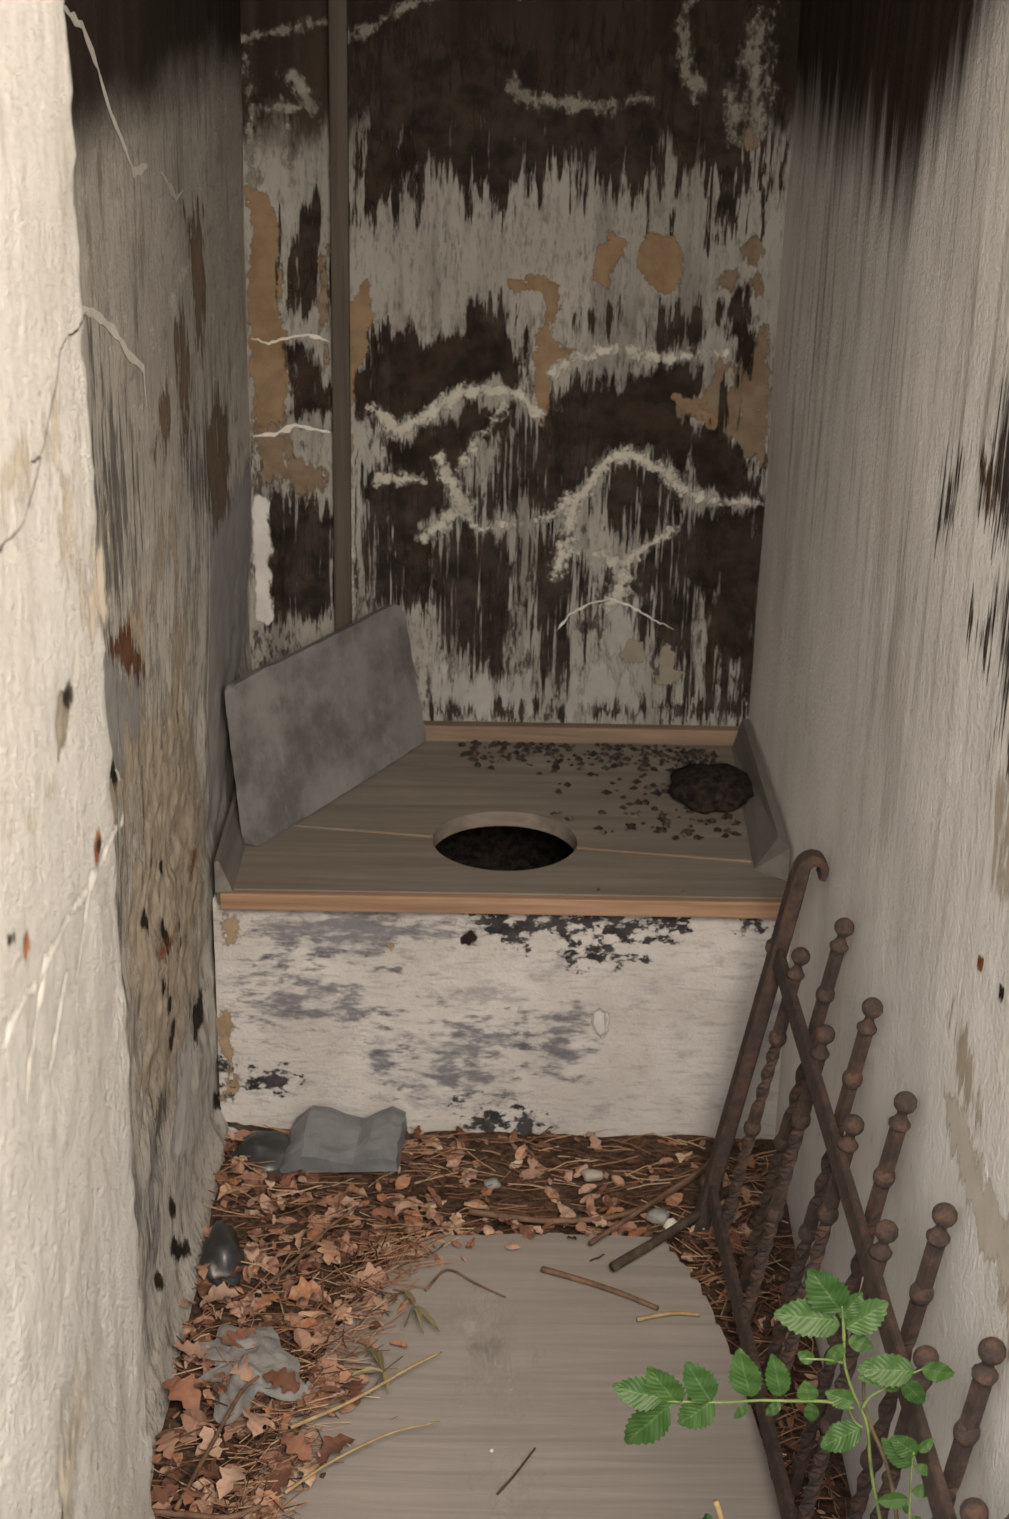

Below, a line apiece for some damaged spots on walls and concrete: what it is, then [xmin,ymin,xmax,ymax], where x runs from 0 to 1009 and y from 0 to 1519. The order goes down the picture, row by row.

flaking render [592,229,685,295]
flaking render [244,185,331,499]
flaking render [350,278,374,405]
flaking render [507,274,576,427]
flaking render [671,323,772,469]
damp [931,343,1009,567]
damp [964,583,996,681]
damp [220,912,694,1030]
damp [735,918,775,936]
damp [215,1010,306,1102]
damp [370,1001,593,1135]
flaking render [944,1087,1009,1326]